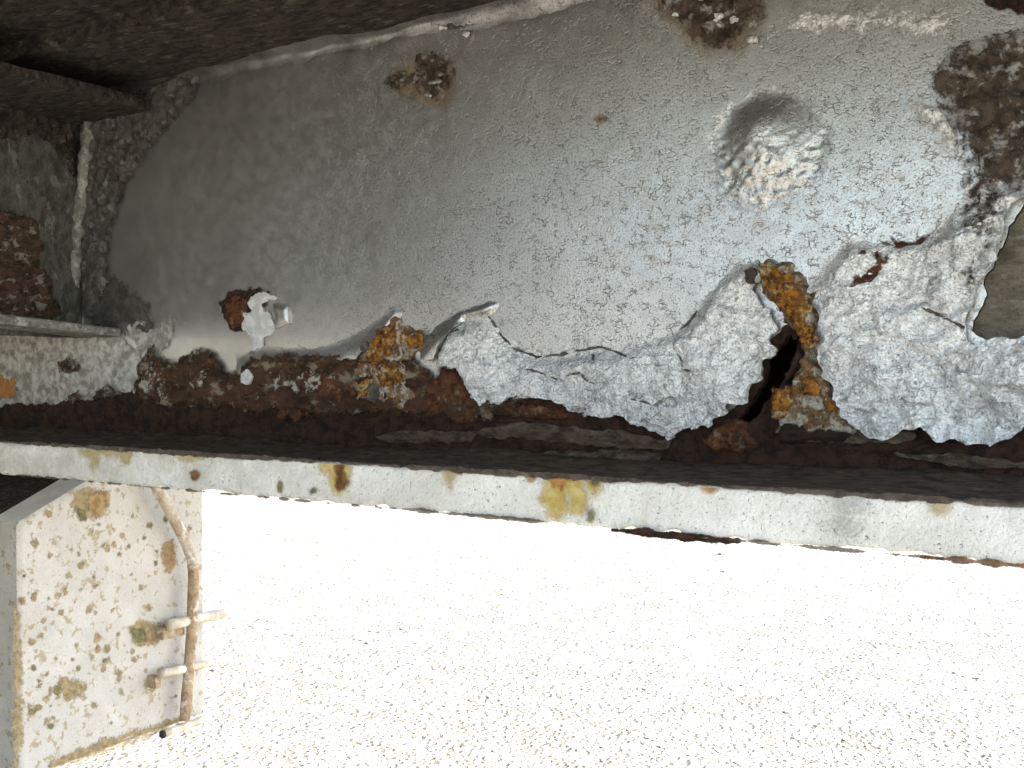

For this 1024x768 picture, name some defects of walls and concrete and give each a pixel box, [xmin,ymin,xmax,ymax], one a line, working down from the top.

peeling [787,6,950,40]
rust [0,210,63,320]
rust [0,258,1024,476]
crack [488,316,634,384]
peeling [434,259,779,441]
crack [677,311,697,372]
peeling [807,176,1024,447]
rust [0,441,1024,535]
rust [154,539,177,573]
rust [11,548,98,768]
rust [91,605,161,695]
rust [49,717,181,767]